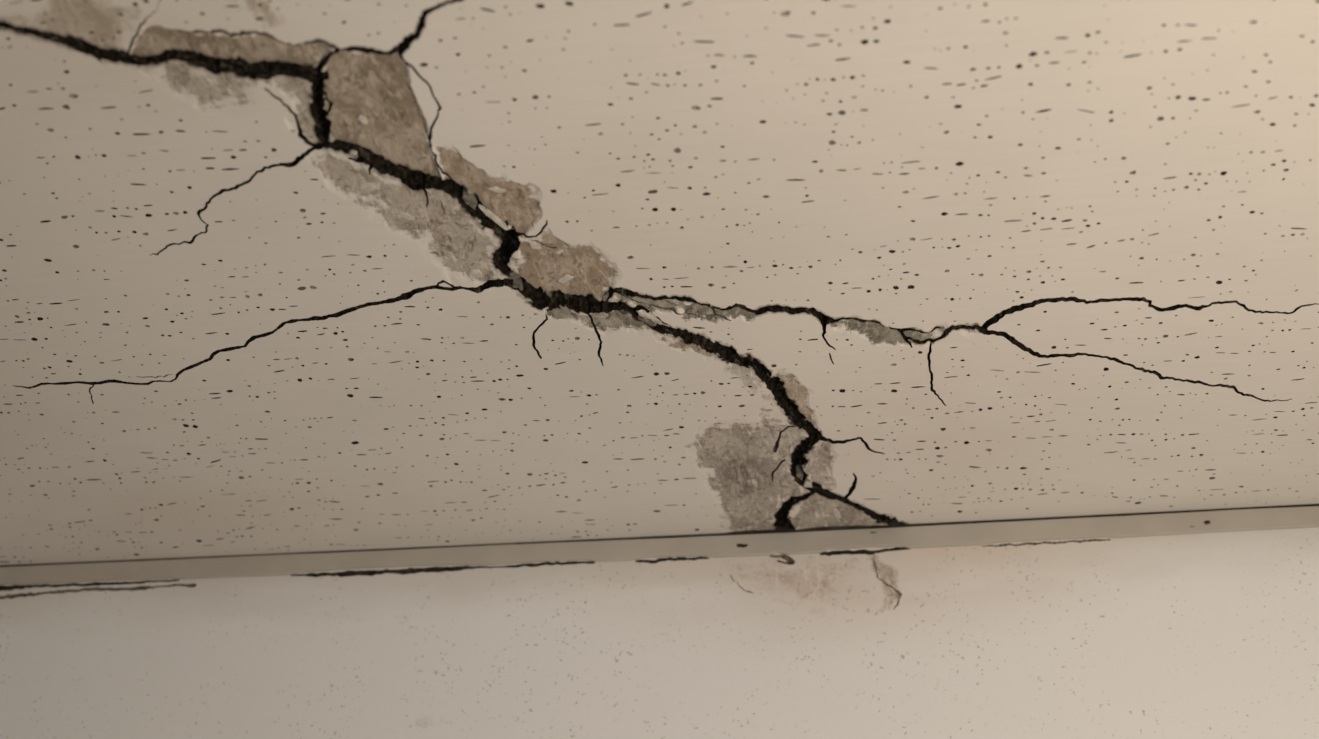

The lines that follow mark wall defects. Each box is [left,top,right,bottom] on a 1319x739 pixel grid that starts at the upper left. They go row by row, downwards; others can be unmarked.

spalling [130,24,756,366]
crack [0,0,1319,530]
spalling [681,368,890,548]
spalling [826,314,981,348]